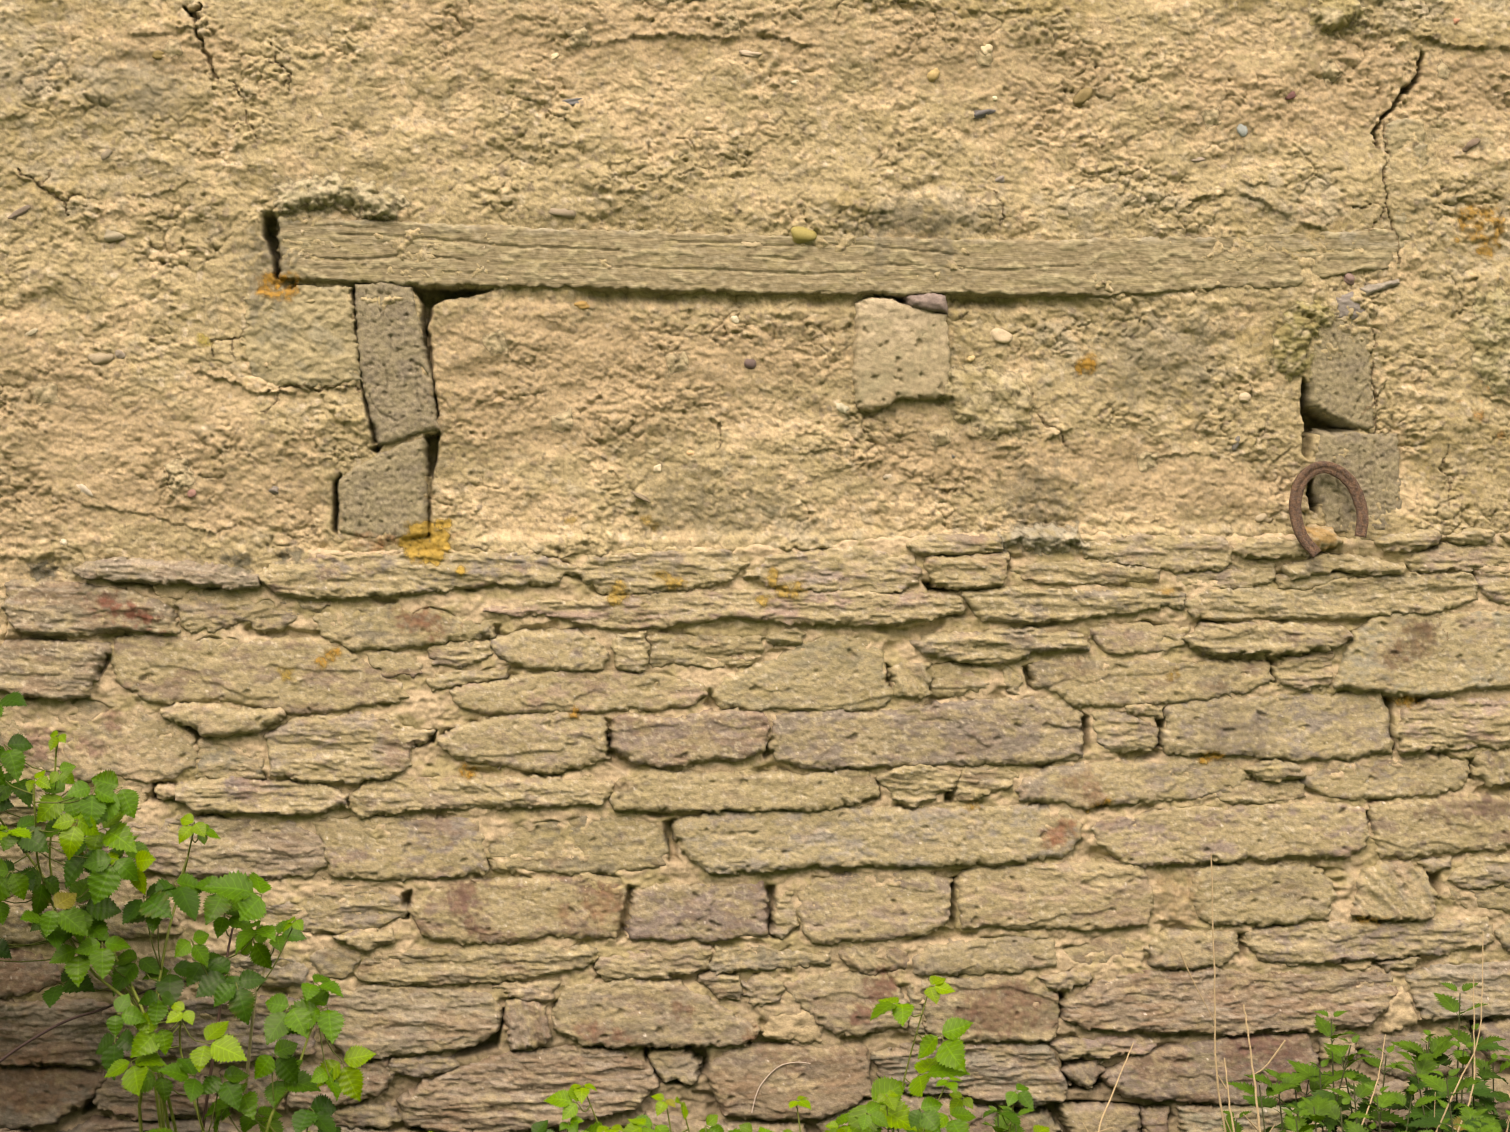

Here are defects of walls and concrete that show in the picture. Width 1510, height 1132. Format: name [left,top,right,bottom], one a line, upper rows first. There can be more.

crack [185,2,292,143]
crack [1352,52,1421,264]